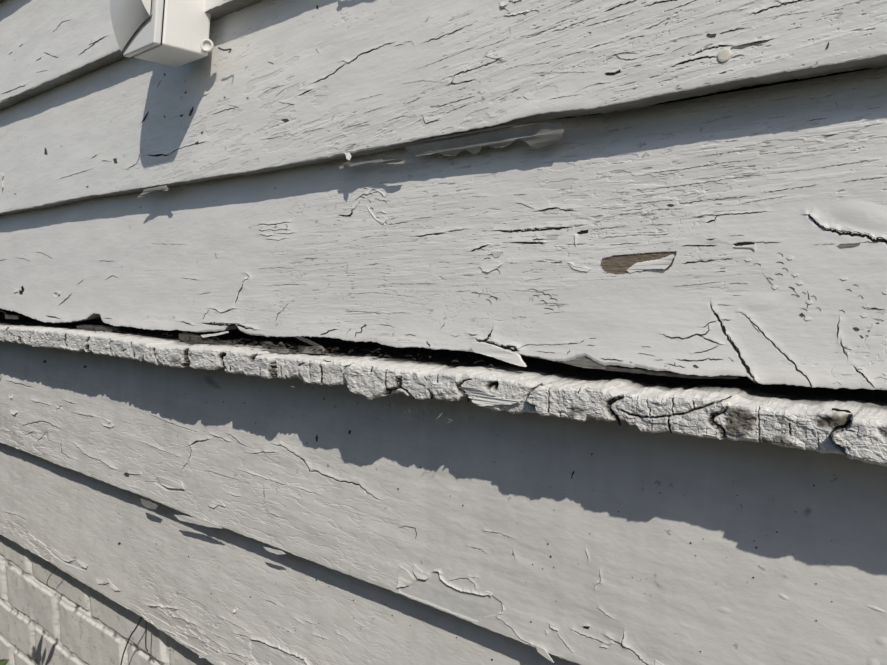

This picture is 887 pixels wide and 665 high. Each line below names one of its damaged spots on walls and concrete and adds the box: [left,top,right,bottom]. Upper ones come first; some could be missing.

crack [263,0,820,127]
crack [6,280,158,361]
crack [184,258,316,329]
crack [321,104,887,387]
peeling [567,251,676,274]
peeling [840,276,883,338]
crack [253,354,282,378]
crack [370,367,498,402]
peeling [461,385,522,406]
crack [147,417,377,499]
crack [817,408,854,447]
peeling [397,564,506,622]